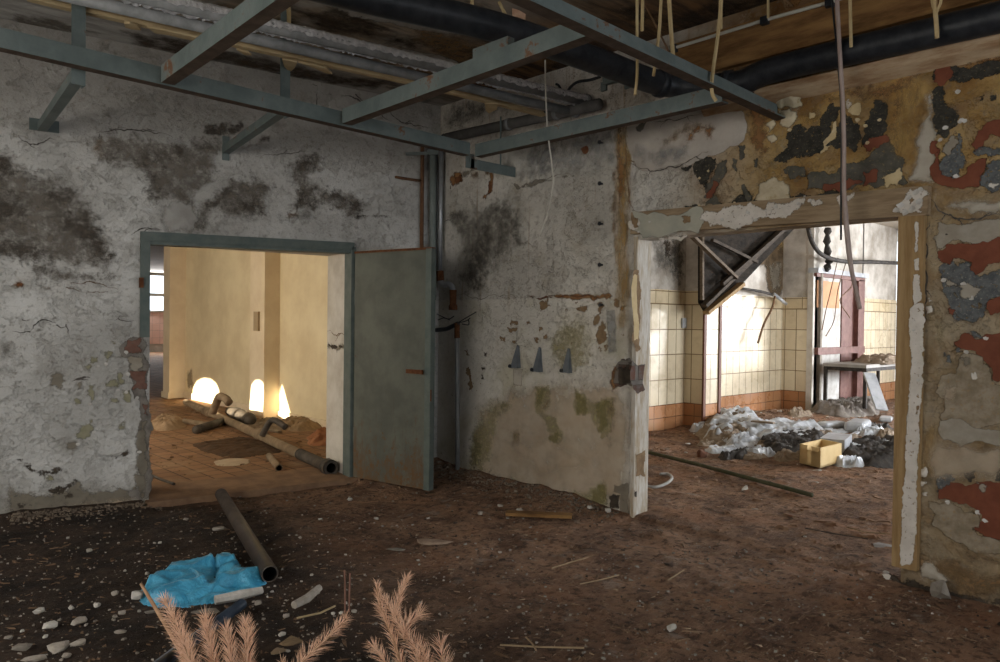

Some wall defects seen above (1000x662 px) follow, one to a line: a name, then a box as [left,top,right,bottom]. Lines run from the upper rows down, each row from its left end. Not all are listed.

water stain [0,157,114,279]
peeling [51,373,65,389]
flaking render [85,337,154,500]
crack [98,127,172,140]
water stain [95,122,270,228]
water stain [290,154,364,217]
water stain [455,206,518,286]
peeling [500,320,547,344]
water stain [470,387,625,500]
corrosion [531,293,612,301]
peeling [565,269,645,394]
peeling [628,60,1000,591]